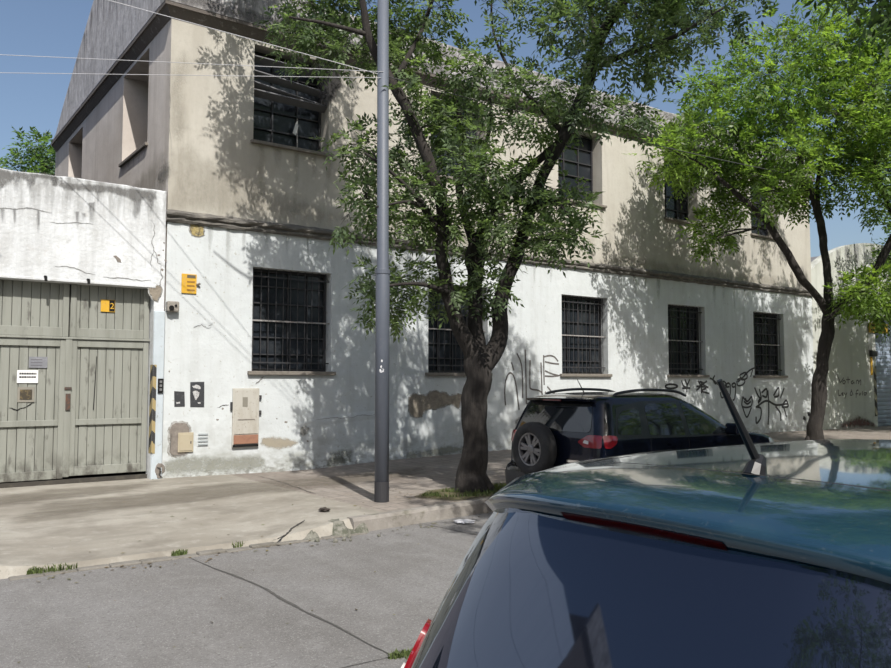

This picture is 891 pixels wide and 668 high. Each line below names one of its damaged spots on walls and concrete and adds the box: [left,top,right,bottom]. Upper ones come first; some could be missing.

damp [0,169,156,211]
spalling [189,224,205,238]
crack [55,223,163,295]
spalling [408,390,462,418]